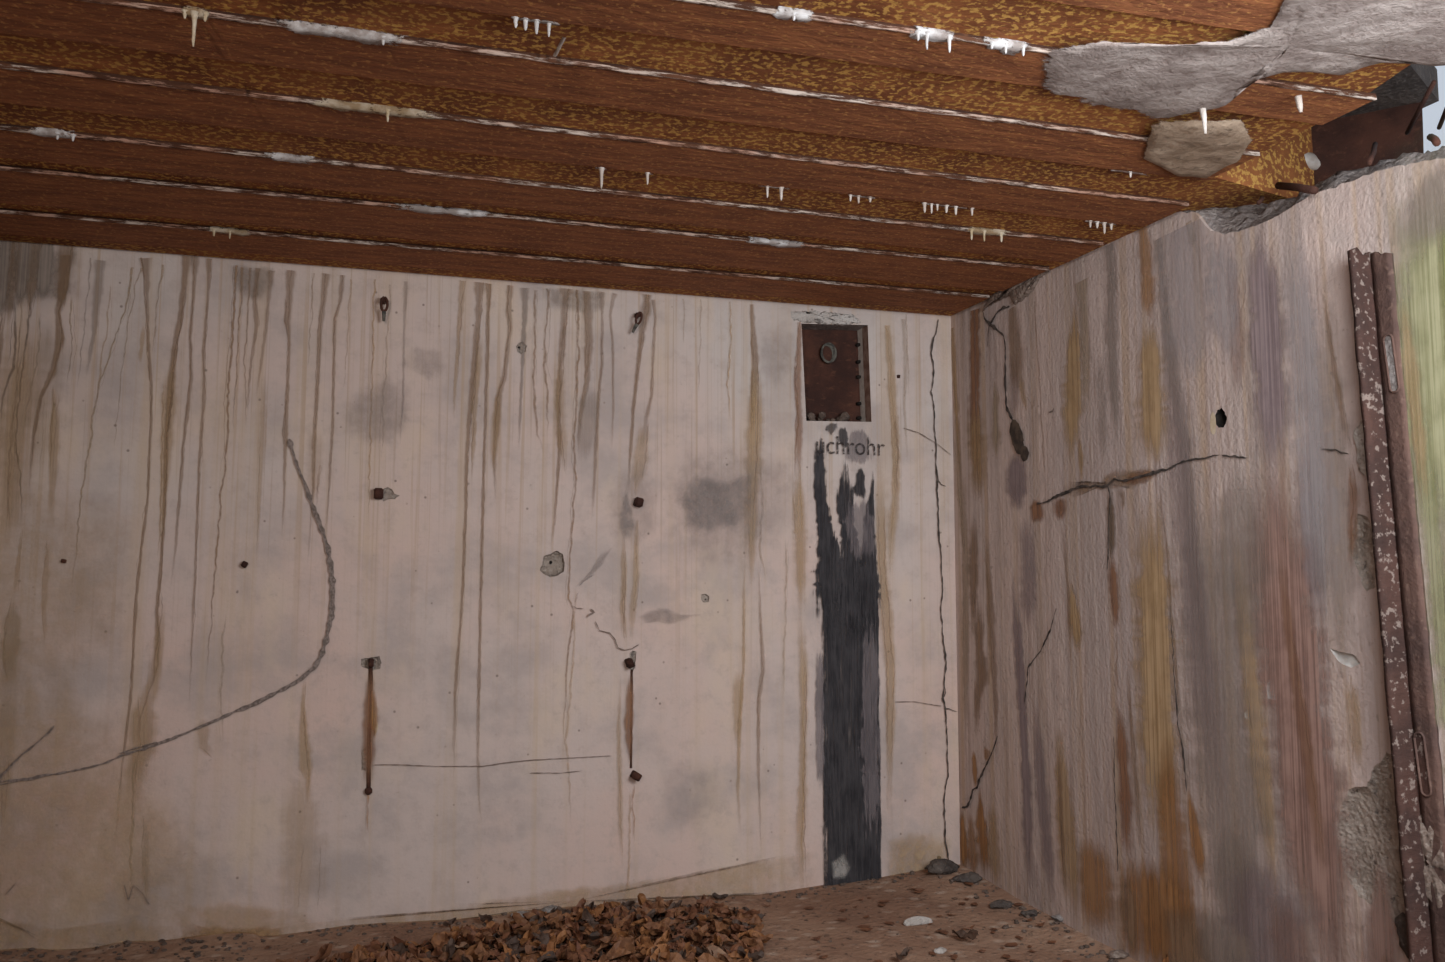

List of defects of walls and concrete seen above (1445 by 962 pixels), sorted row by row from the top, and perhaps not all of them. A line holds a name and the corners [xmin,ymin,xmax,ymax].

damp [276,19,405,46]
damp [773,6,814,23]
damp [909,25,955,53]
damp [984,36,1028,56]
damp [311,98,437,122]
spalling [1275,80,1445,194]
crack [983,306,1054,462]
crack [1037,455,1246,569]
crack [1024,610,1056,703]
corrosion [364,683,377,770]
corrosion [625,684,633,752]
spalling [1338,752,1405,923]